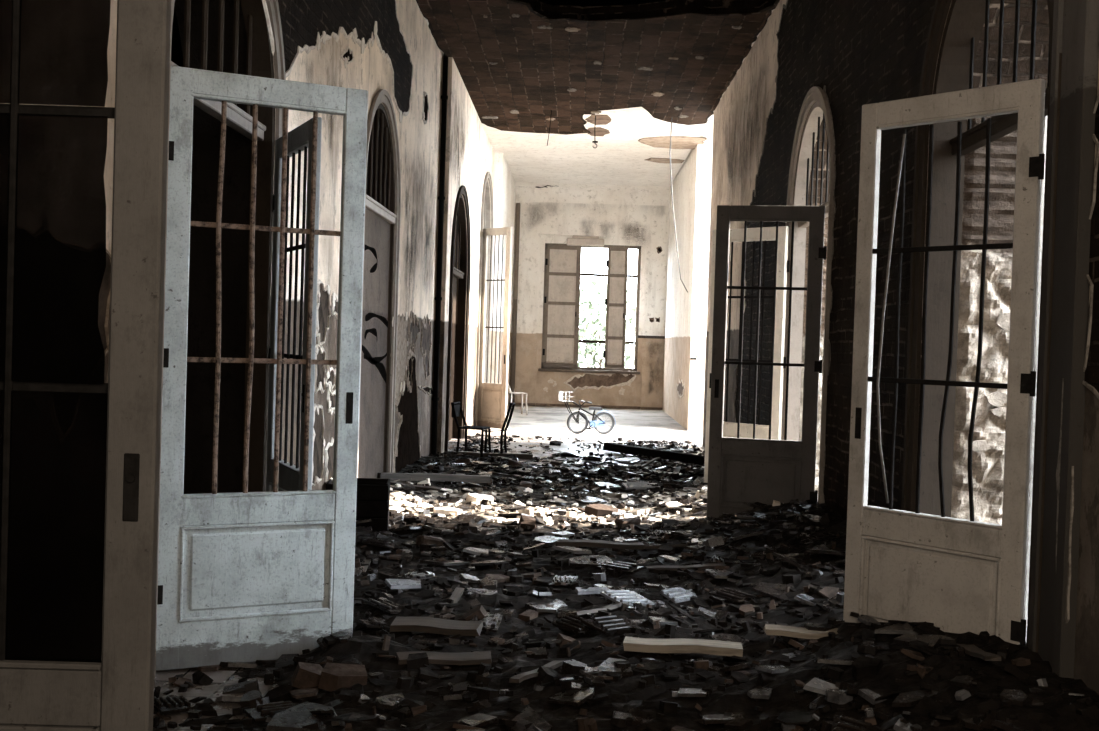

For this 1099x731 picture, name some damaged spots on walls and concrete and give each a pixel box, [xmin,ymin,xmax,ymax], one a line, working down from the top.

flaking render [262,0,429,125]
flaking render [416,0,936,520]
flaking render [1083,89,1099,399]
peeling [312,279,338,486]
spalling [392,311,433,473]